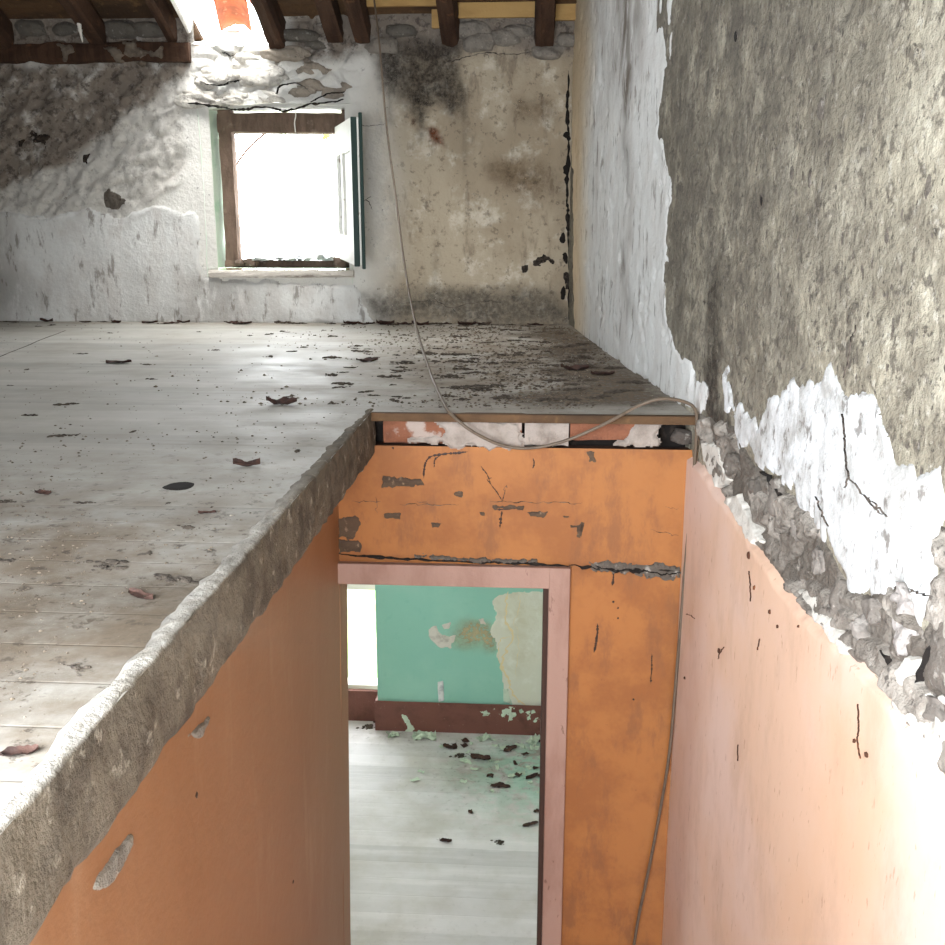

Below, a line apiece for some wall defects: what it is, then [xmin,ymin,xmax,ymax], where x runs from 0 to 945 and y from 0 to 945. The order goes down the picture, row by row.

water stain [379,42,462,114]
peeling [0,188,373,323]
flaking render [522,254,555,273]
water stain [370,290,567,323]
peeling [563,0,945,774]
peeling [381,476,424,488]
crack [841,414,888,517]
peeling [480,505,548,518]
crack [814,496,829,527]
peeling [339,515,362,553]
crack [339,553,681,574]
peeling [479,591,543,745]